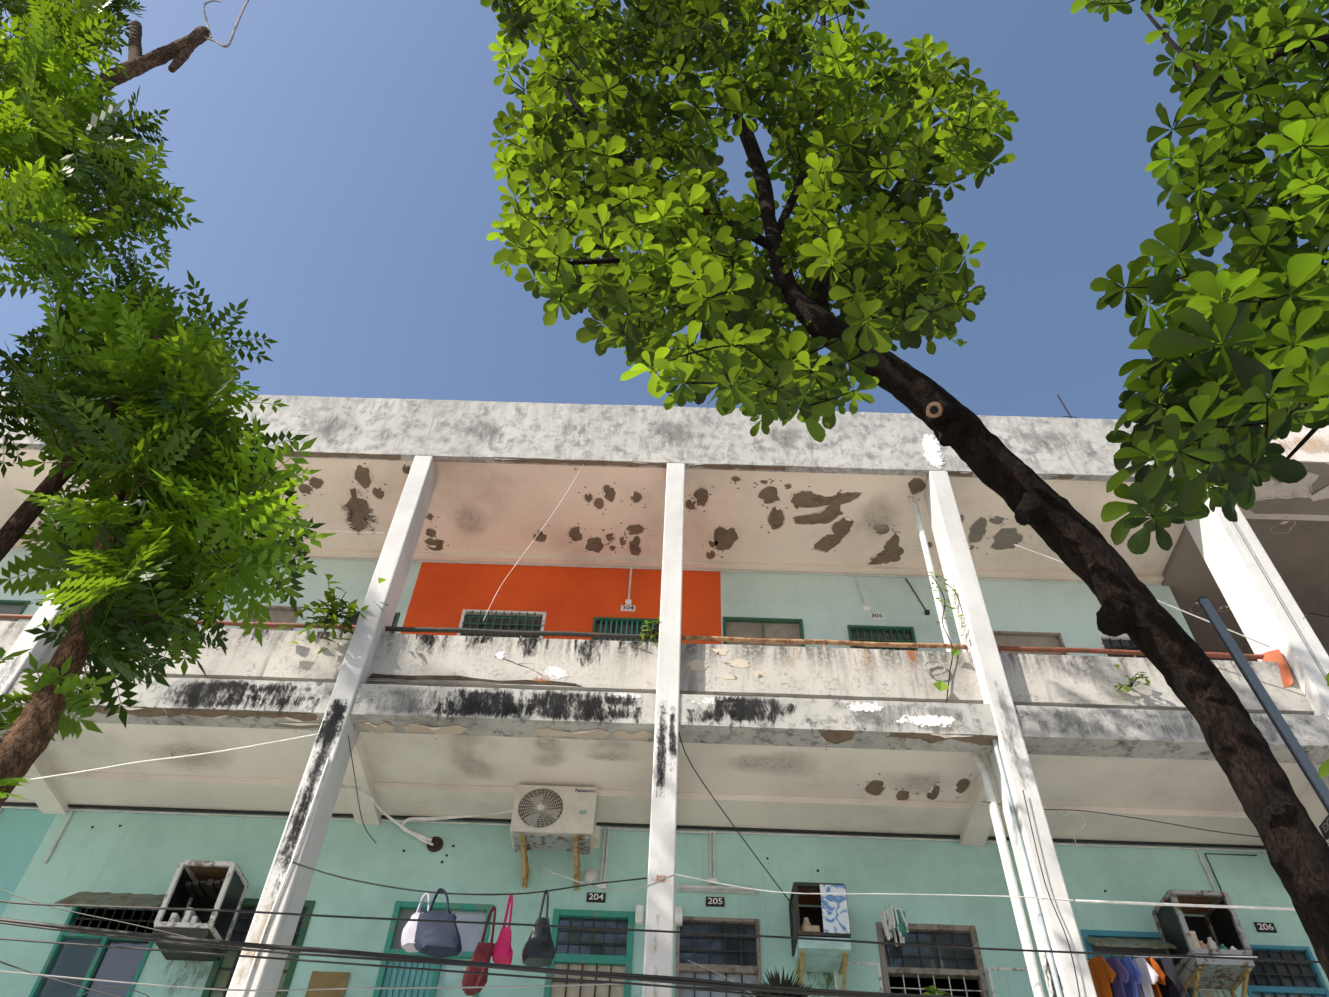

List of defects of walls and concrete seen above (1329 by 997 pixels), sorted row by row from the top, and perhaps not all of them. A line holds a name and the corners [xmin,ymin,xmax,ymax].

peeling [283,452,411,535]
spalling [494,458,666,470]
peeling [533,483,652,556]
peeling [684,464,933,565]
peeling [960,514,1032,555]
leakage [371,688,641,725]
leakage [656,696,795,797]
leakage [162,679,347,965]
peeling [858,773,972,800]